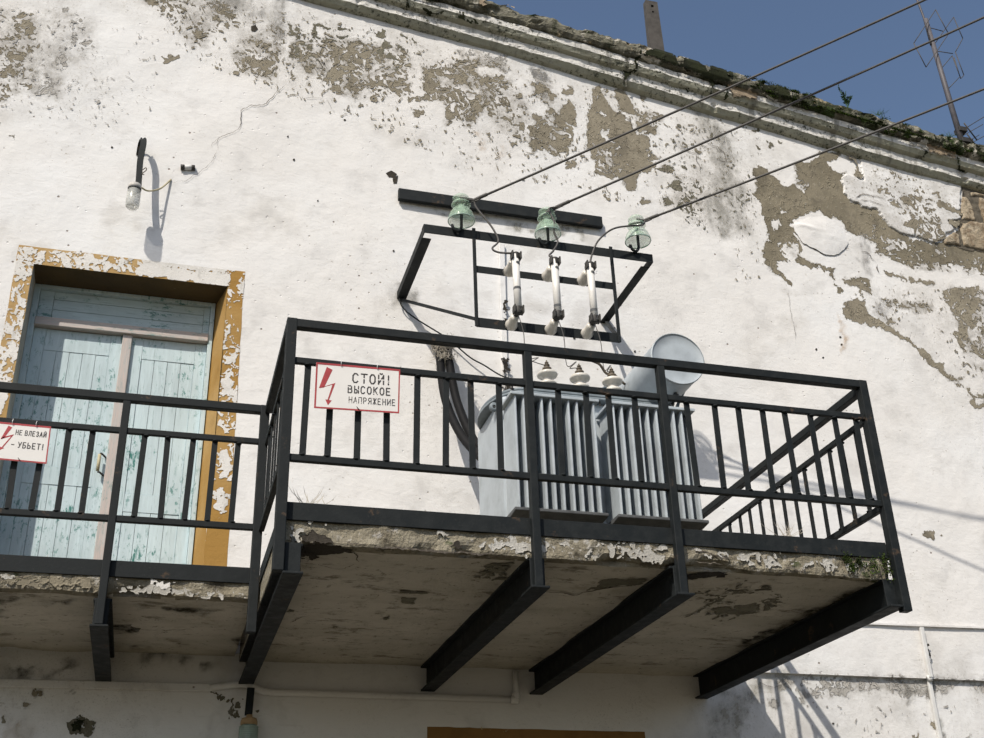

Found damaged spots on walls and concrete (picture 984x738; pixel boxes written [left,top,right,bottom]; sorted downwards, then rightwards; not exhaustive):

peeling [0,7,105,118]
peeling [128,0,984,409]
peeling [0,246,245,514]
spalling [290,521,352,560]
peeling [474,534,579,581]
peeling [584,540,668,564]
peeling [119,579,246,600]
spalling [684,548,877,621]
peeling [769,674,984,725]
flaking render [66,715,96,737]